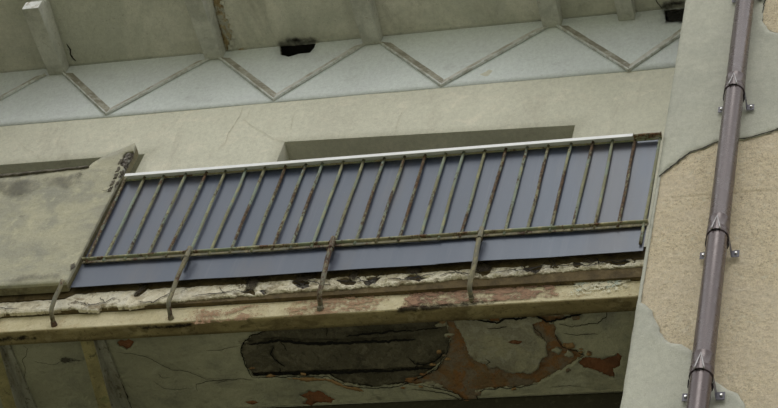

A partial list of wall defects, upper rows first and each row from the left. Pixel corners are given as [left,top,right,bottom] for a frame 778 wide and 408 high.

peeling [213,0,248,51]
hole [662,1,684,22]
flaking render [763,0,778,33]
hole [279,38,315,57]
flaking render [338,277,380,286]
spalling [238,314,622,406]